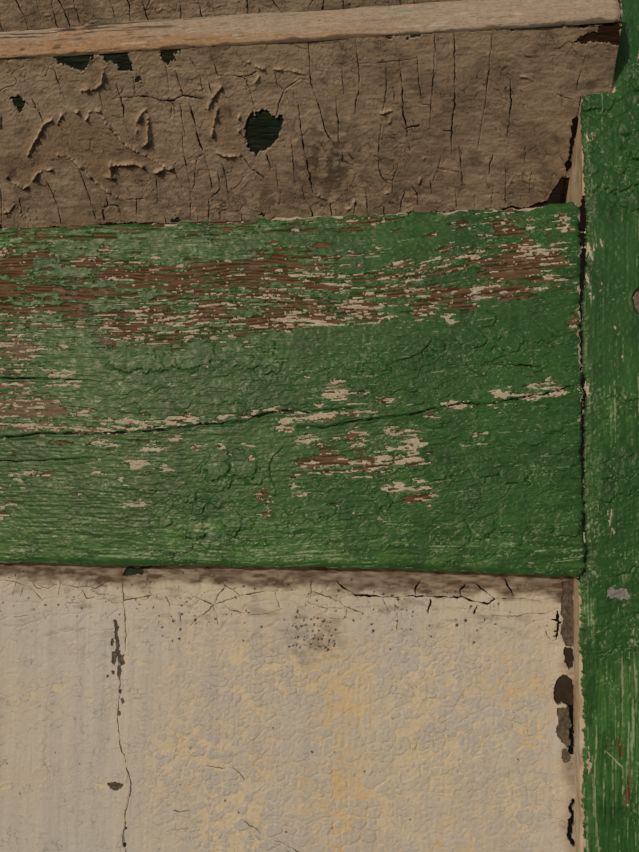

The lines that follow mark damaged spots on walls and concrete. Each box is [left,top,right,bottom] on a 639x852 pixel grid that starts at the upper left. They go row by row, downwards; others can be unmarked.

crack [15,0,85,30]
peeling [54,52,142,84]
peeling [159,49,181,65]
peeling [563,21,622,46]
peeling [11,95,26,113]
peeling [244,109,284,156]
crack [0,34,588,581]
peeling [0,177,603,509]
peeling [0,470,54,529]
peeling [554,582,574,763]
crack [6,567,562,852]
peeling [567,799,575,846]